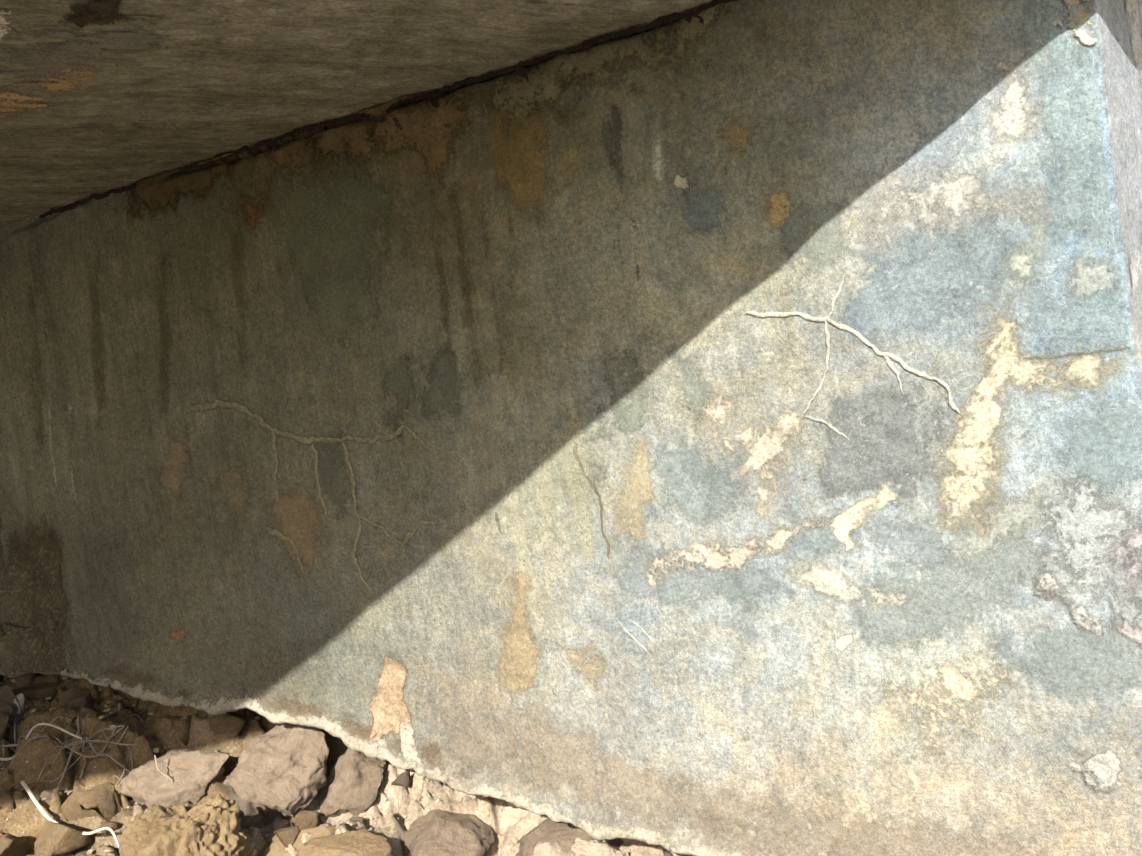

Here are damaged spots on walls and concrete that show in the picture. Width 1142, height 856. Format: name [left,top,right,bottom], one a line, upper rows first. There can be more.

spalling [1051,0,1097,45]
leakage [0,532,68,676]
crack [190,399,442,594]
peeling [697,391,801,516]
peeling [646,484,906,606]
crack [746,275,961,440]
peeling [852,162,1142,648]
spalling [60,656,755,856]
peeling [883,662,1011,757]
peeling [1068,749,1123,794]